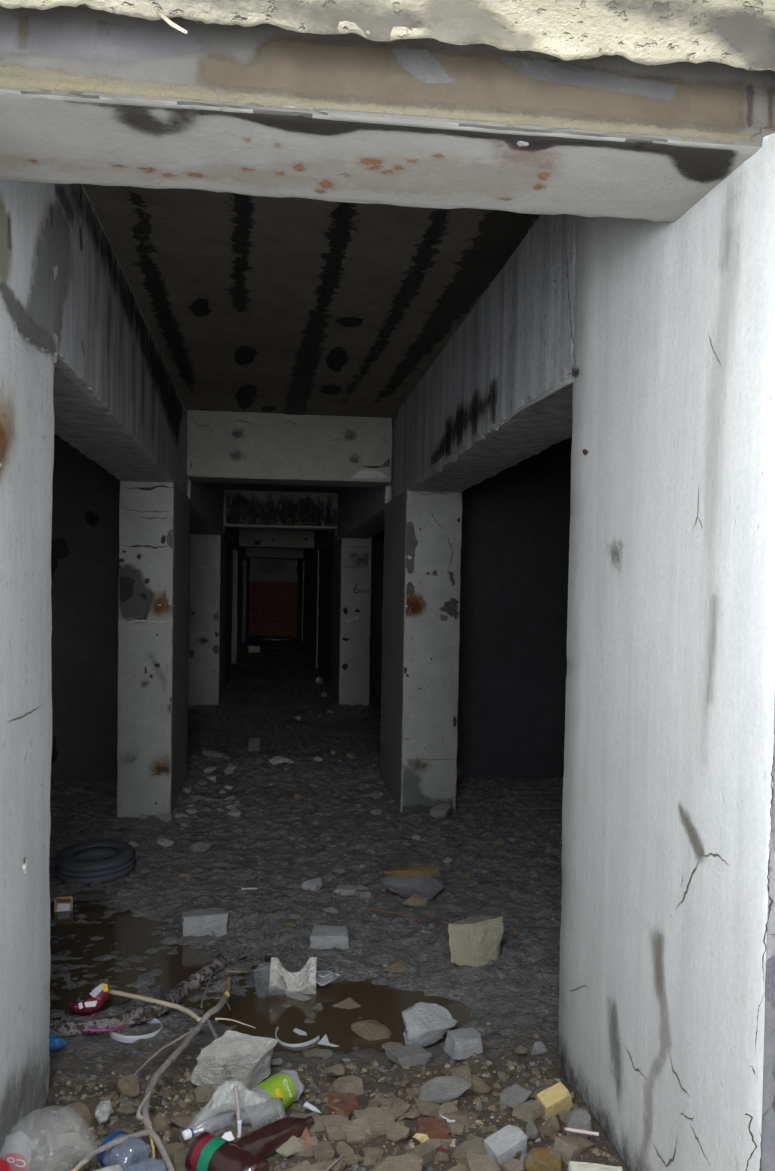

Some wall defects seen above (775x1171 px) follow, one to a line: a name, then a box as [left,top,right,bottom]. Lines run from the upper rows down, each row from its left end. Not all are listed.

rust [361,160,416,174]
damp [225,193,256,313]
damp [234,202,450,415]
rust [0,408,12,467]
rust [405,594,425,616]
peeling [406,522,459,621]
crack [677,805,730,907]
crack [653,936,661,994]
crack [745,724,775,1171]
crack [624,1045,709,1167]